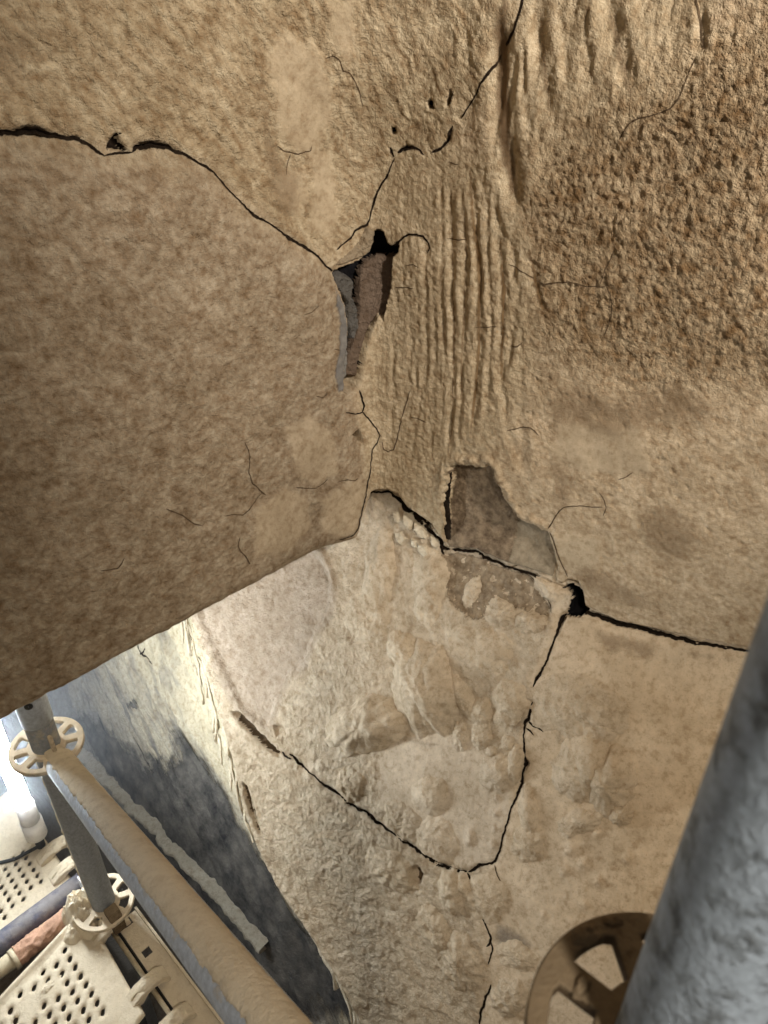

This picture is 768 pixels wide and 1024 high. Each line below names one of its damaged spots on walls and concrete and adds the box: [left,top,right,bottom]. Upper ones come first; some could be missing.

crack [0,0,538,580]
spalling [392,465,557,620]
crack [282,472,748,881]
crack [479,919,493,1024]